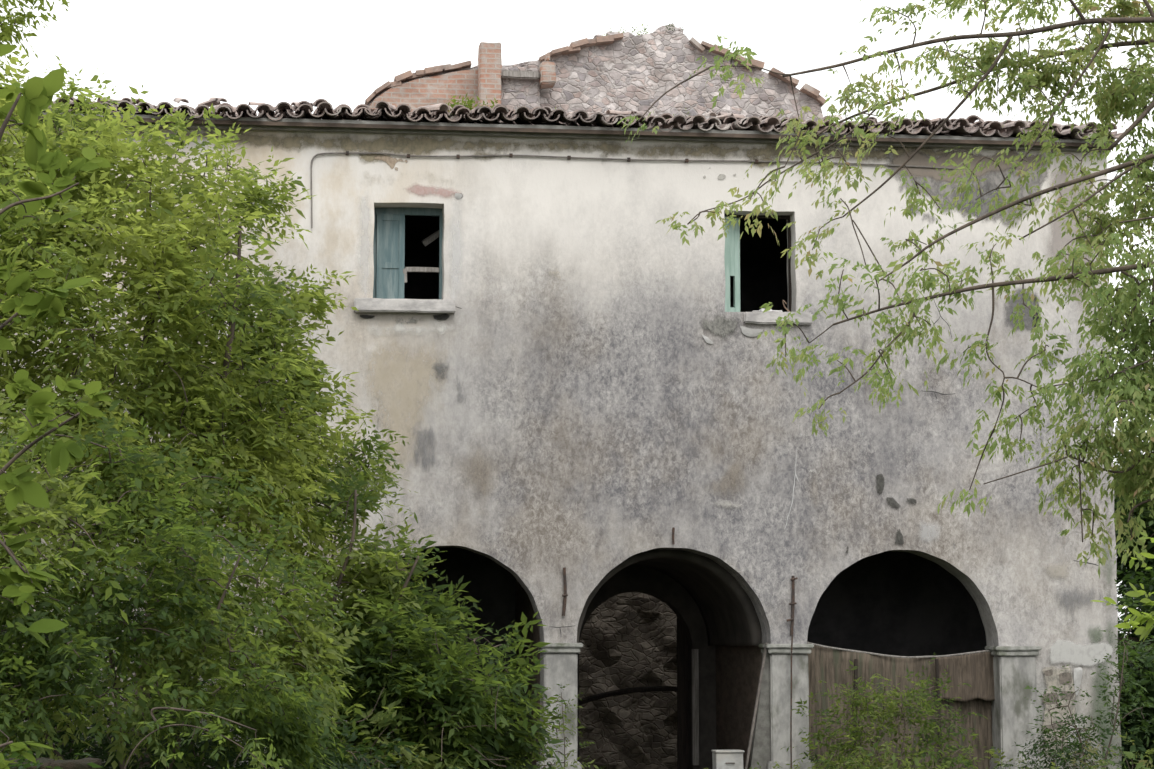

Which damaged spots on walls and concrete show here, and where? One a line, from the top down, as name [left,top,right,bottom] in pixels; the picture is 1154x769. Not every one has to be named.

flaking render [410,185,463,200]
water stain [368,349,448,473]
spalling [876,474,916,508]